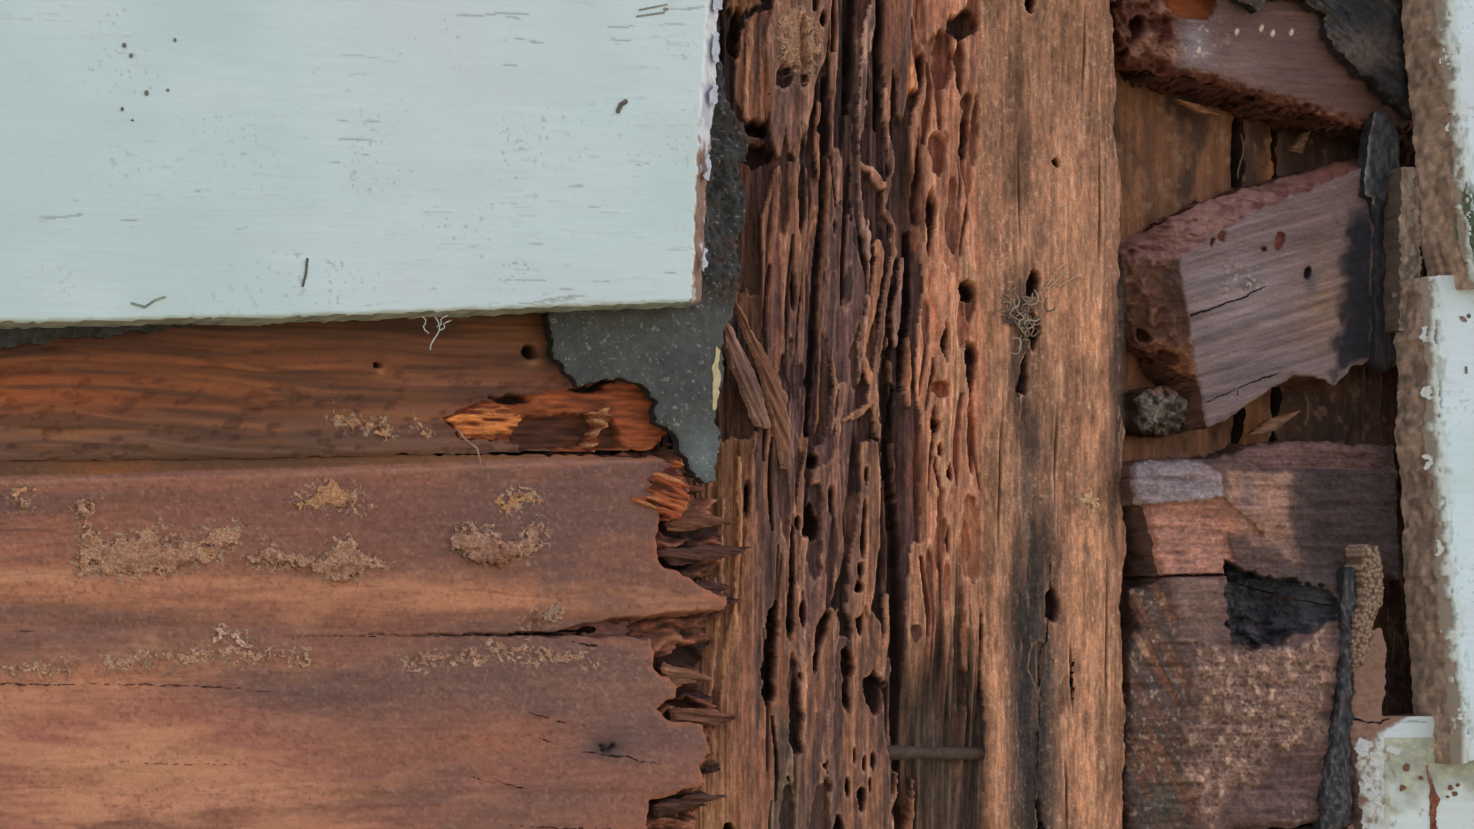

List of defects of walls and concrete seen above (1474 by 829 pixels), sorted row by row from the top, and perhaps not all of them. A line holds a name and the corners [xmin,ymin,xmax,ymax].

crack [334,626,610,647]
corrosion [1399,763,1460,829]